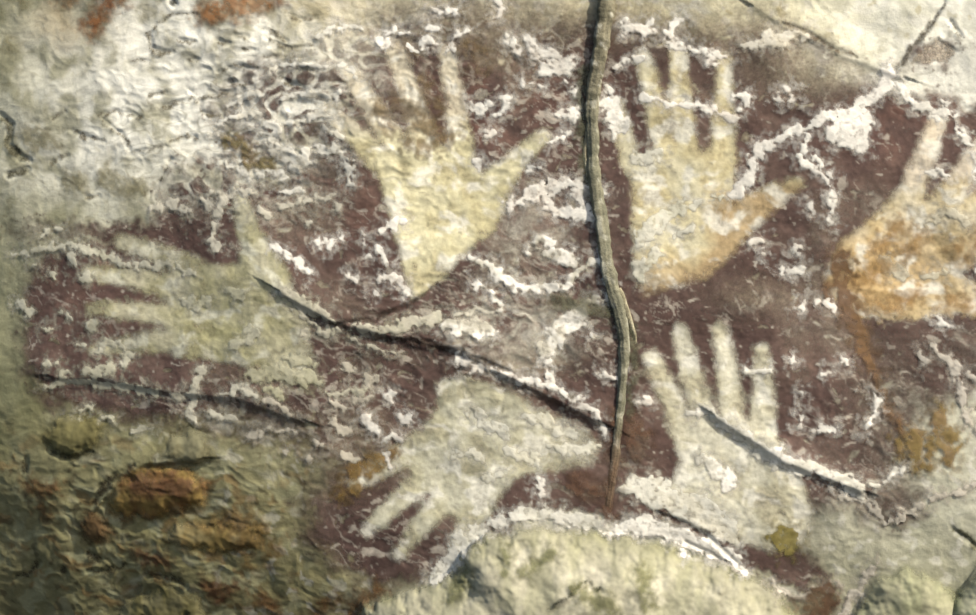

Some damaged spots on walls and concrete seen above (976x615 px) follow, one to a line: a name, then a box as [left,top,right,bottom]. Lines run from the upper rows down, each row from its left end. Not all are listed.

crack [893,3,960,71]
damp [16,0,619,585]
damp [598,14,976,540]
damp [570,585,620,615]
damp [636,568,655,612]
damp [718,537,832,593]